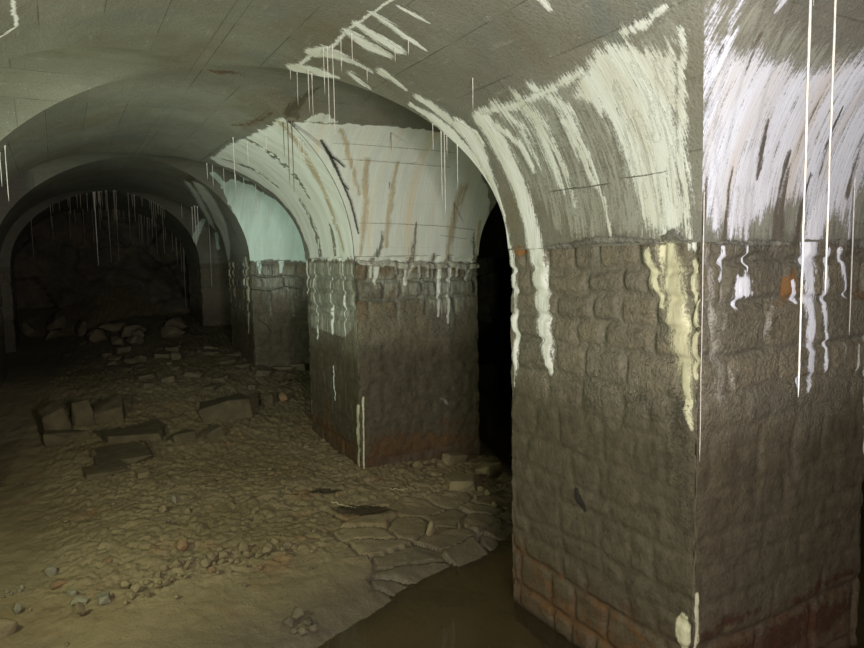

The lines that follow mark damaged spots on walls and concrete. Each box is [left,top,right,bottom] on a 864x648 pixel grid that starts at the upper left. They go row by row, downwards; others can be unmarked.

corrosion [341,131,369,251]
crack [320,140,472,239]
leakage [184,0,864,431]
corrosion [780,269,797,302]
leakage [356,397,365,469]
leakage [675,593,699,648]